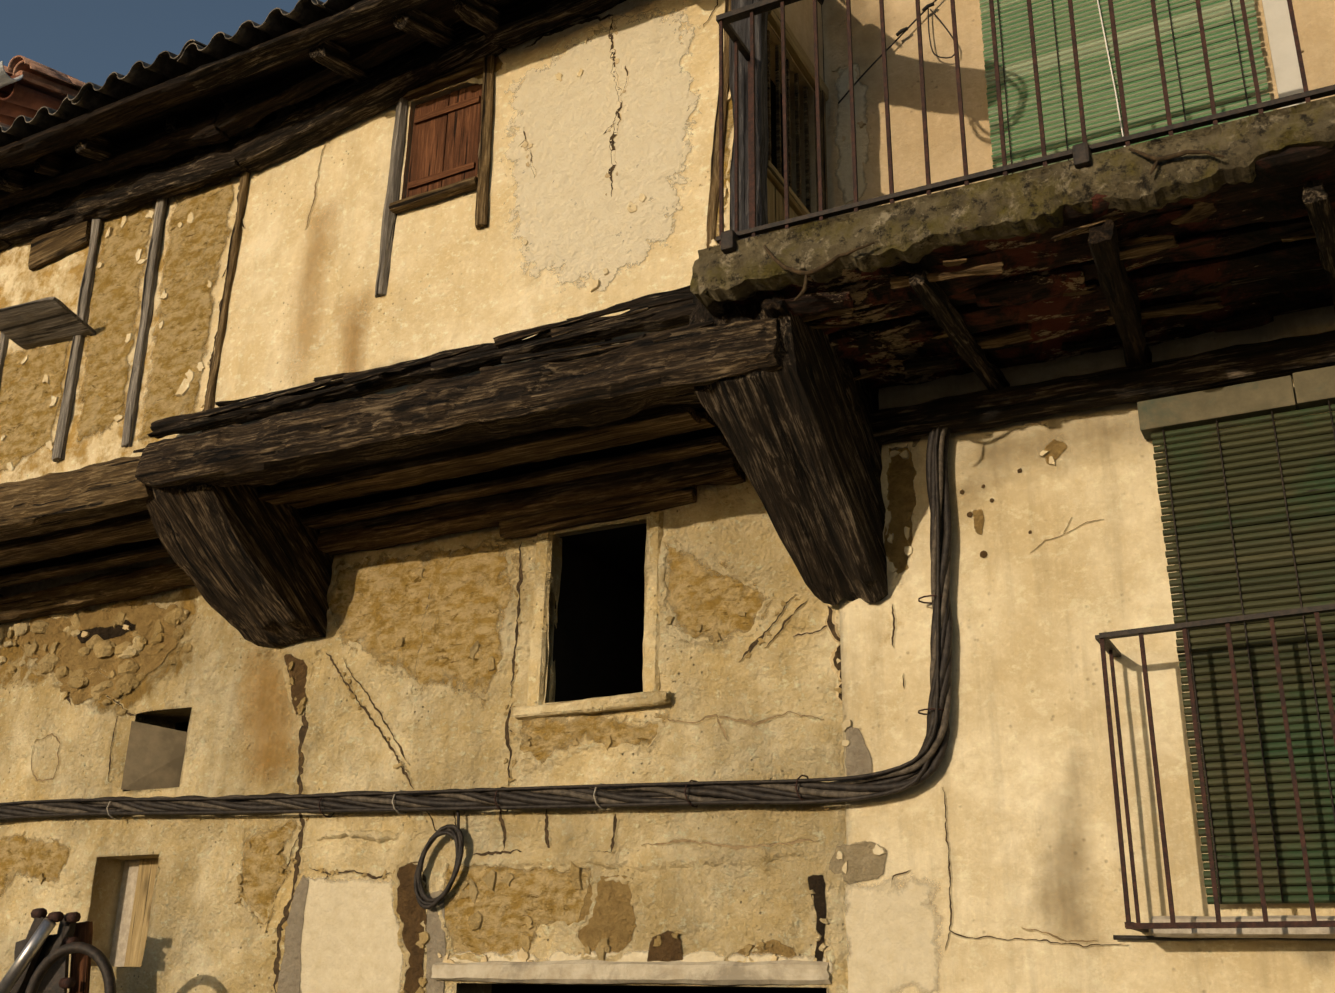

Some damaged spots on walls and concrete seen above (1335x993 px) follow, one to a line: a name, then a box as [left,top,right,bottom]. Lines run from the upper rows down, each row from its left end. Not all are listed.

crack [523,14,629,197]
peeling [467,7,734,293]
flaking render [77,201,155,442]
flaking render [138,179,234,440]
peeling [880,438,925,586]
flaking render [0,599,193,716]
crack [472,542,552,857]
crack [655,594,842,741]
crack [890,604,906,688]
crack [265,652,457,993]
crack [587,814,620,854]
flaking render [390,851,848,993]